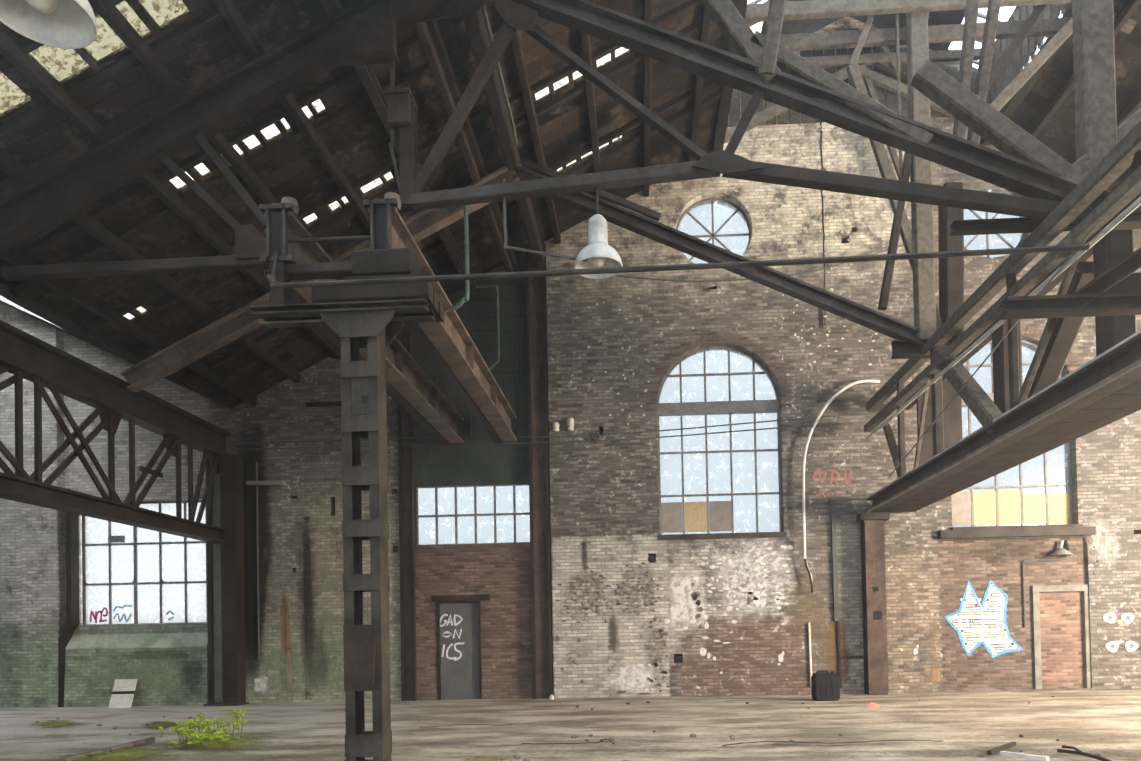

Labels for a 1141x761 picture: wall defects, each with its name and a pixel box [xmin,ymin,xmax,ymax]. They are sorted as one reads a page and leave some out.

peeling [556,541,793,695]